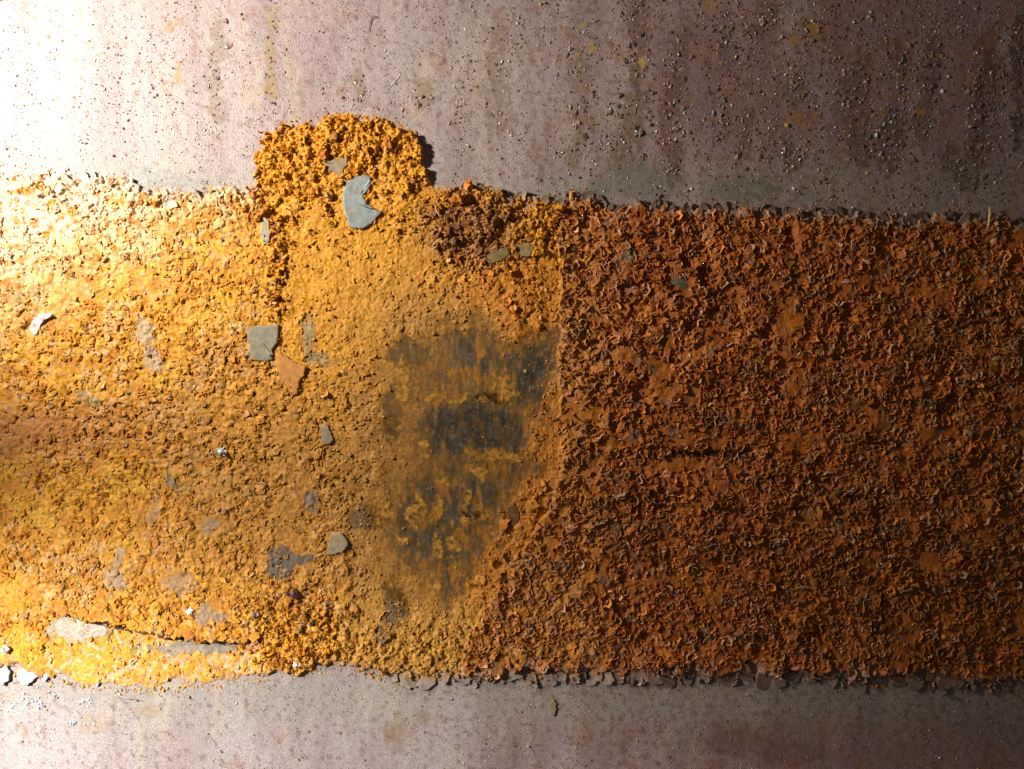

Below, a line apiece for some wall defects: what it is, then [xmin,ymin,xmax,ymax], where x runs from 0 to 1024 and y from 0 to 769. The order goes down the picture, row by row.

peeling [246,324,279,362]
peeling [323,157,381,229]
peeling [266,307,561,647]
corrosion [0,98,1024,703]